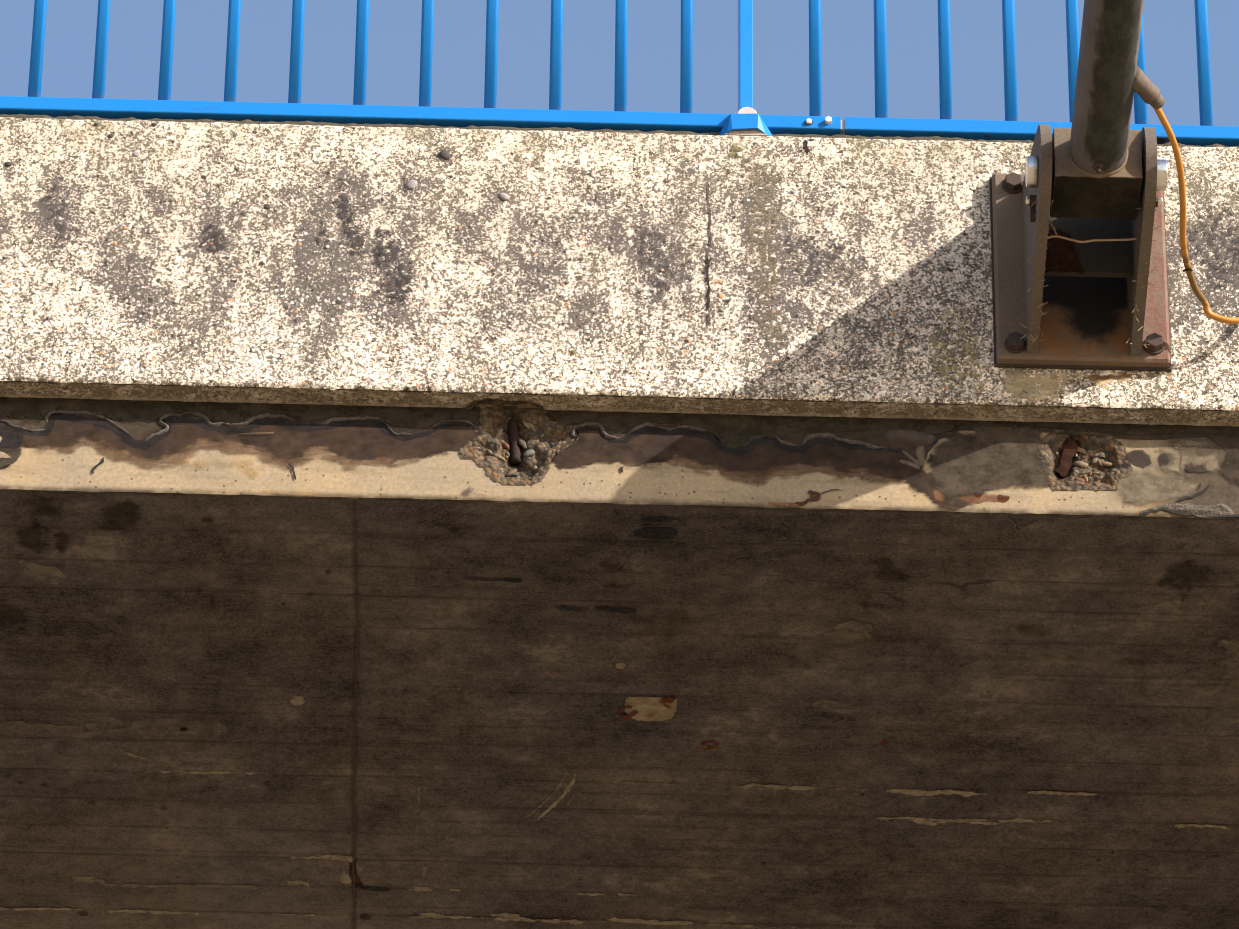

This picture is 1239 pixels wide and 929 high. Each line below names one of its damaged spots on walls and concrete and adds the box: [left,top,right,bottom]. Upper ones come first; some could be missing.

water stain [316,177,372,257]
crack [704,183,712,326]
water stain [739,153,787,346]
water stain [0,410,481,469]
spalling [458,398,579,485]
water stain [546,410,1239,510]
spalling [1038,430,1133,491]